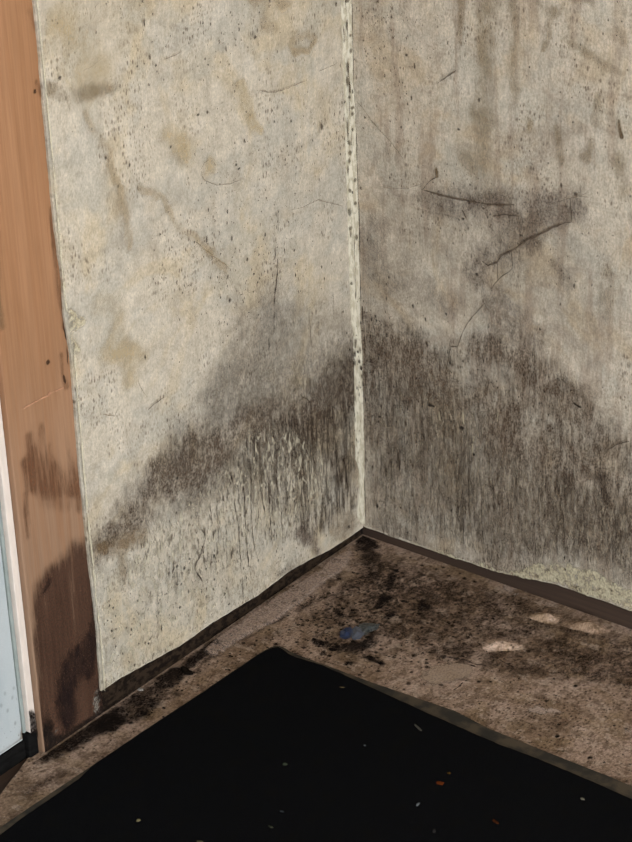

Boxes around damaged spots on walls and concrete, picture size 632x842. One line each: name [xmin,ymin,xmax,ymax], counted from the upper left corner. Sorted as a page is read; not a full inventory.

leakage [335,0,423,79]
leakage [332,49,362,216]
crack [384,177,517,217]
leakage [428,156,581,254]
crack [482,193,586,281]
crack [446,302,486,369]
leakage [14,282,632,763]